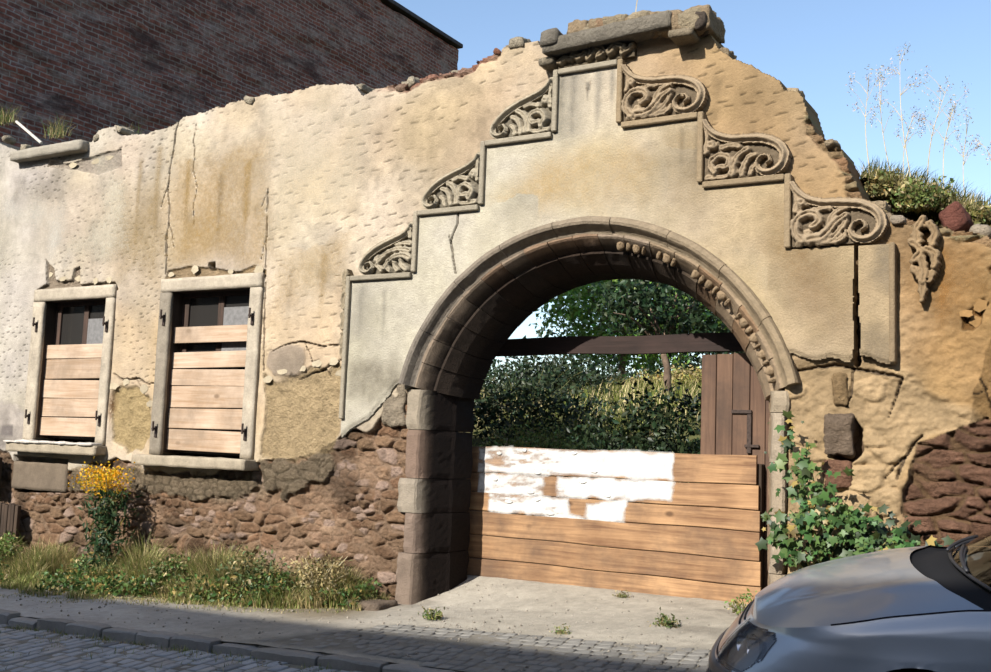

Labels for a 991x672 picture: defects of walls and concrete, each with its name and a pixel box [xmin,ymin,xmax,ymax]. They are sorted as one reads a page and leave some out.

crack [161,121,198,274]
crack [261,188,342,371]
crack [448,213,459,274]
peeling [109,379,153,407]
peeling [300,357,341,376]
flaking render [0,387,419,600]
flaking render [901,416,991,548]